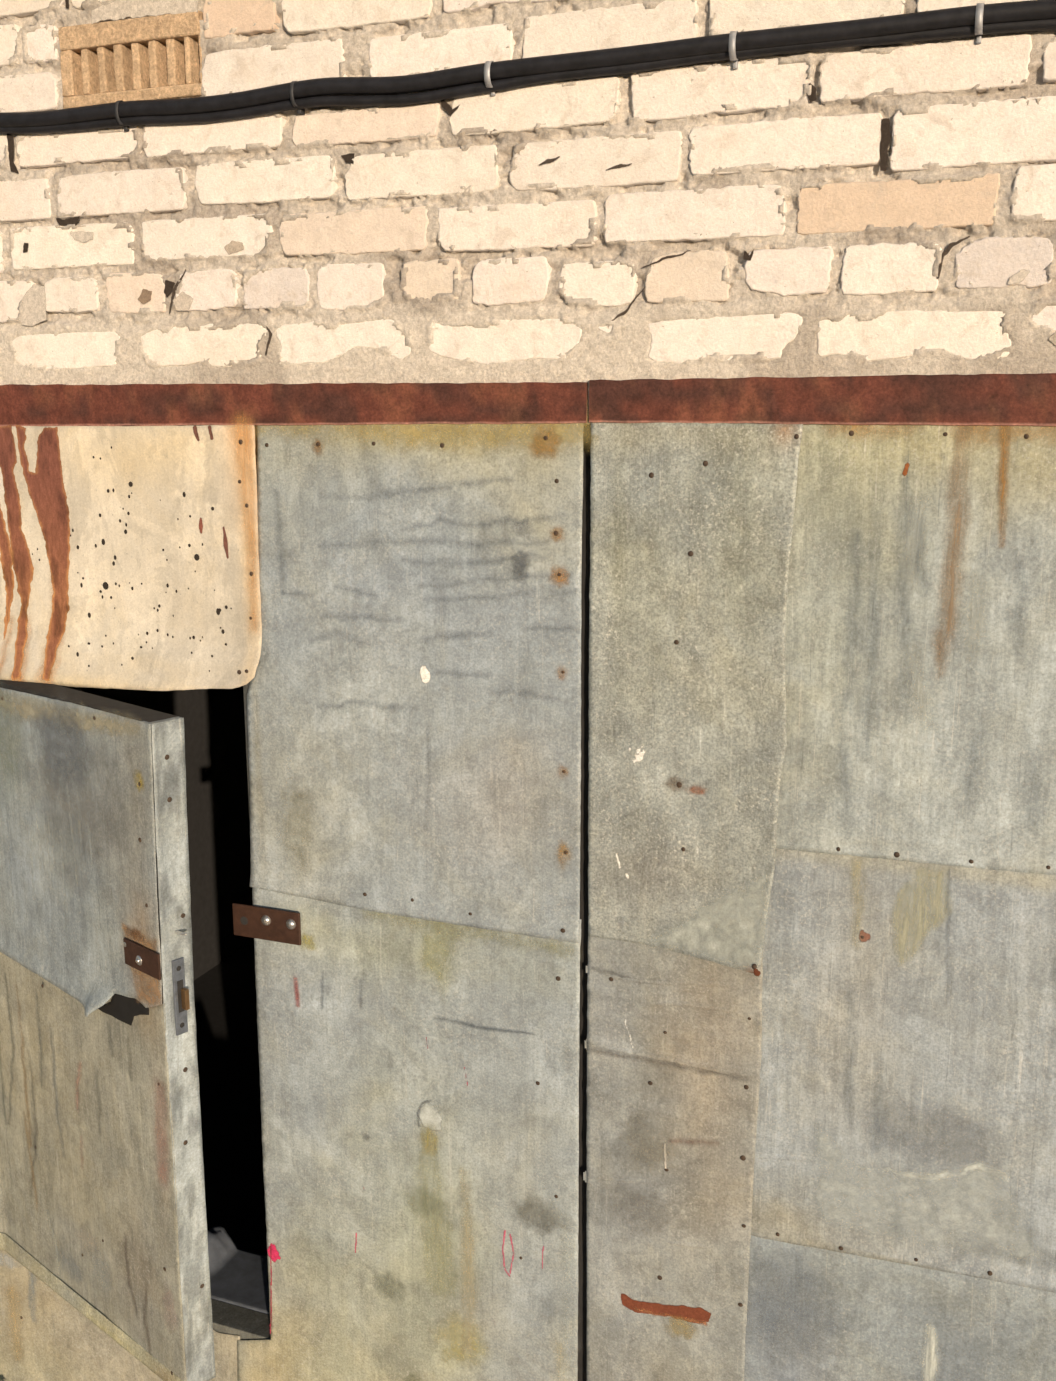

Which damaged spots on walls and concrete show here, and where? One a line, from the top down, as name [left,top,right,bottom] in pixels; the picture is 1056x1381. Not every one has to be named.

corrosion [340,416,588,454]
corrosion [957,426,1008,509]
corrosion [0,425,70,681]
corrosion [938,501,962,656]
corrosion [621,1294,711,1325]
water stain [925,1326,936,1381]